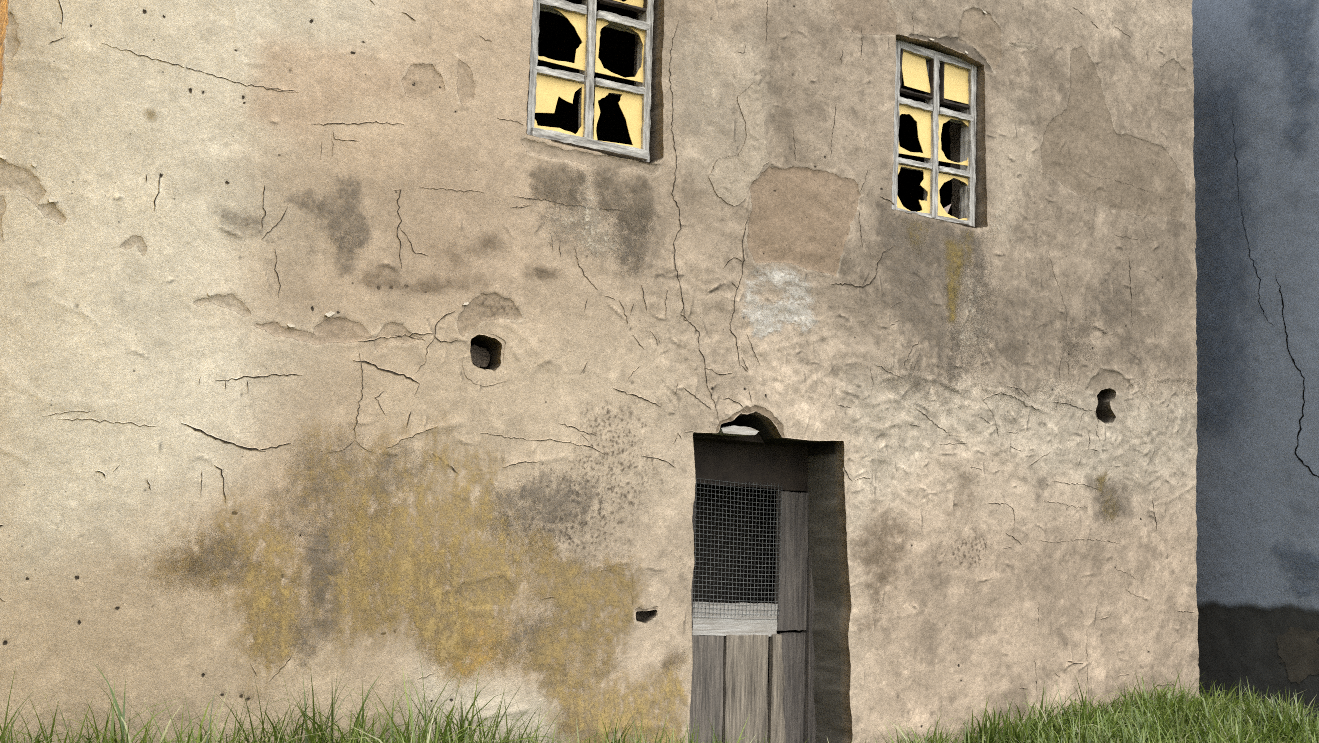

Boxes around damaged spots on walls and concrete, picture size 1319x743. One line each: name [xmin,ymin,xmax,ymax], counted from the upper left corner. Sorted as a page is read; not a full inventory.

crack [102,43,299,93]
leakage [289,176,397,286]
crack [394,20,760,468]
leakage [530,166,658,270]
flaking render [747,166,861,276]
flaking render [194,291,422,352]
crack [199,373,302,393]
crack [326,311,507,474]
crack [42,410,291,503]
leakage [495,407,654,573]
leakage [194,505,398,662]
leakage [414,542,465,662]